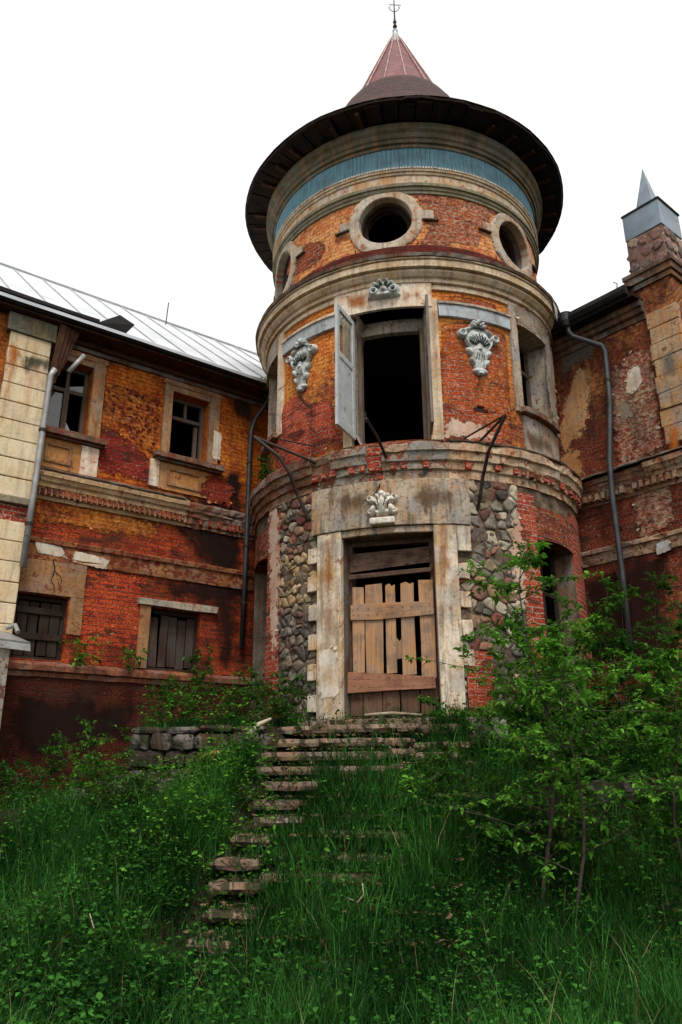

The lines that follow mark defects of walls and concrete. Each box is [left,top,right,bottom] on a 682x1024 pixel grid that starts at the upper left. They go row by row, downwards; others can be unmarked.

spalling [610,349,663,469]
leakage [179,527,241,570]
leakage [186,473,241,512]
spalling [630,486,679,554]
leakage [14,697,133,760]